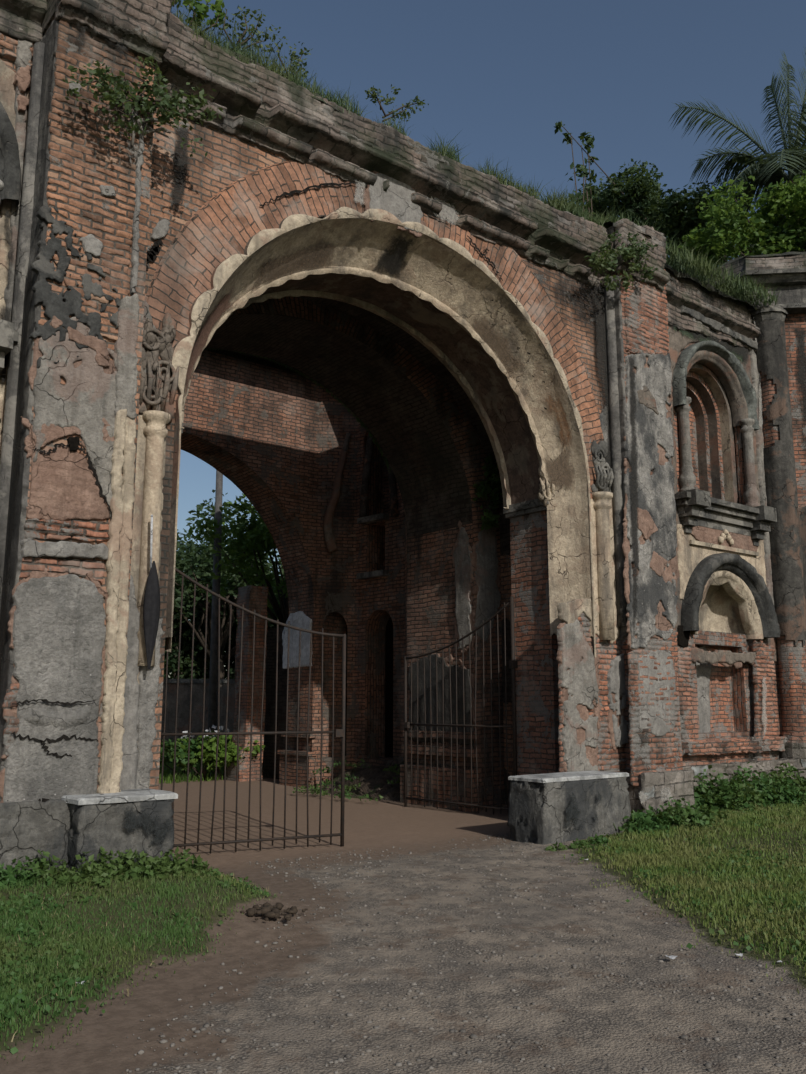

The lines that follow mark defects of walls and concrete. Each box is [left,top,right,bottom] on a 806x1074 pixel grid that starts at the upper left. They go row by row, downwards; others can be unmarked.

water stain [171,127,190,210]
flaking render [45,19,145,367]
crack [260,181,358,206]
flaking render [151,219,170,240]
water stain [374,236,414,277]
flaking render [23,423,110,542]
flaking render [637,508,658,540]
flaking render [557,598,600,624]
crack [12,698,95,706]
crack [11,732,98,758]